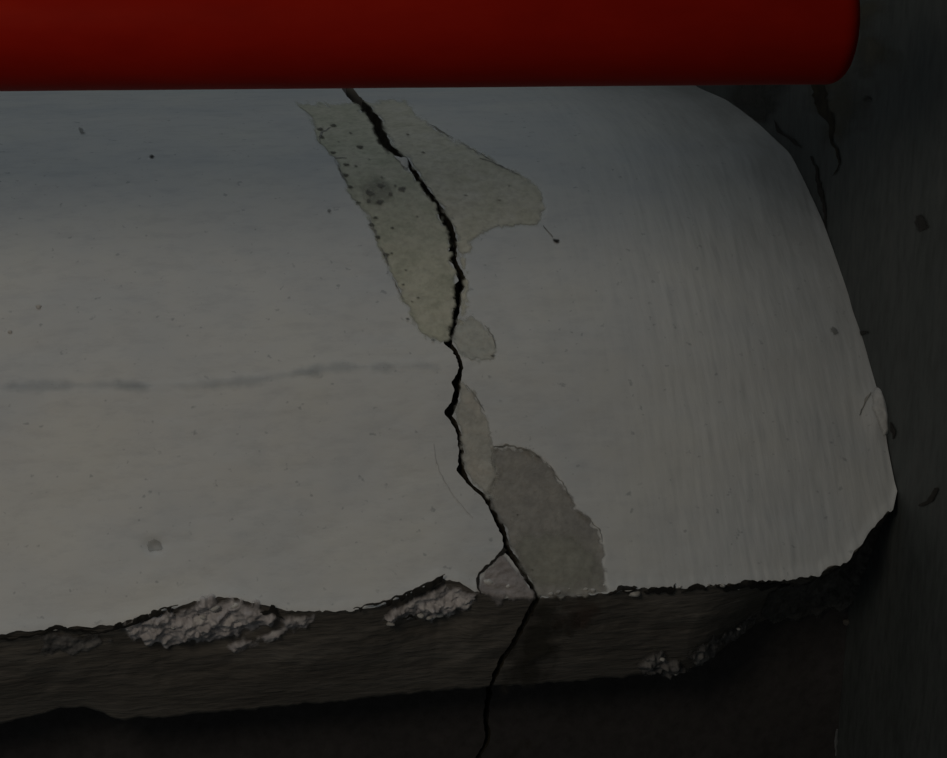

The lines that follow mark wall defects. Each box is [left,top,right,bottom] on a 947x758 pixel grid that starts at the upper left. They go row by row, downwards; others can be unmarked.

peeling [298,99,559,360]
flaking render [0,595,314,655]
crack [360,100,541,758]
peeling [353,382,881,626]
flaking render [638,652,687,679]